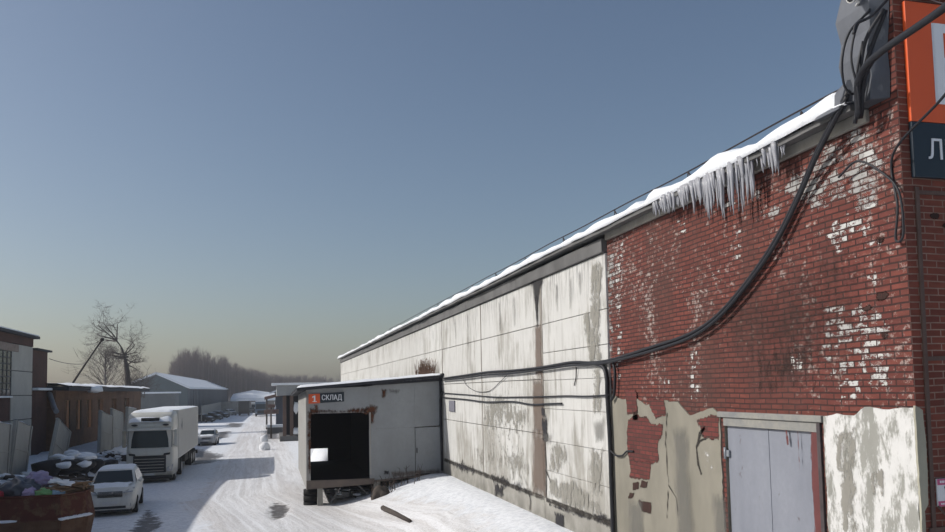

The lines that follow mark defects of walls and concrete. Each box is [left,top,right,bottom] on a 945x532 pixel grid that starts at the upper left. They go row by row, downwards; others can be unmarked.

damp [785,128,889,254]
corrosion [307,389,386,473]
damp [531,278,545,493]
spalling [697,414,719,440]